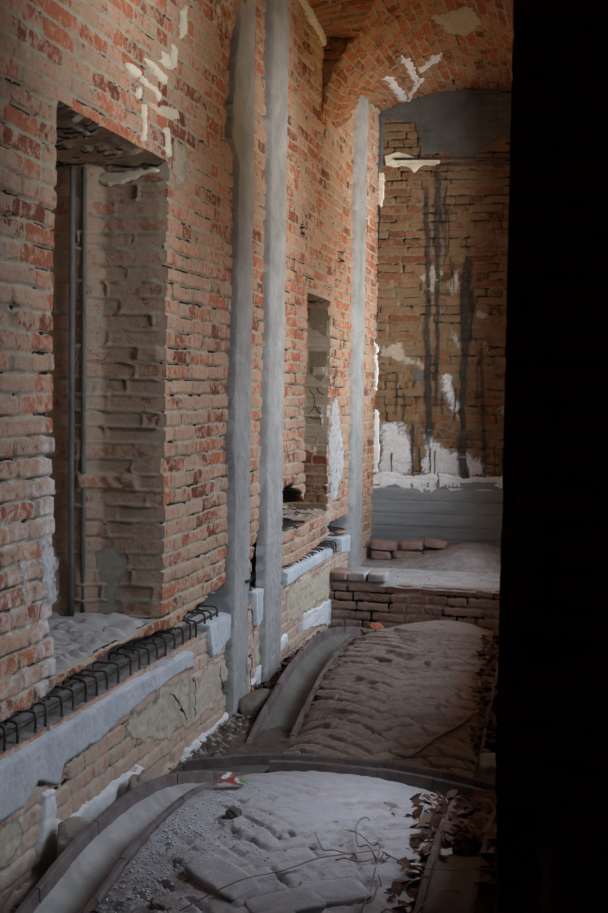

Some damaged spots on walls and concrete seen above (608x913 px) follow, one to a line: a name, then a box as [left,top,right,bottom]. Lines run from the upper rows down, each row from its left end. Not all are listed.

water stain [379,170,503,479]
peeling [372,409,503,493]
peeling [126,658,228,742]
peeling [181,712,229,762]